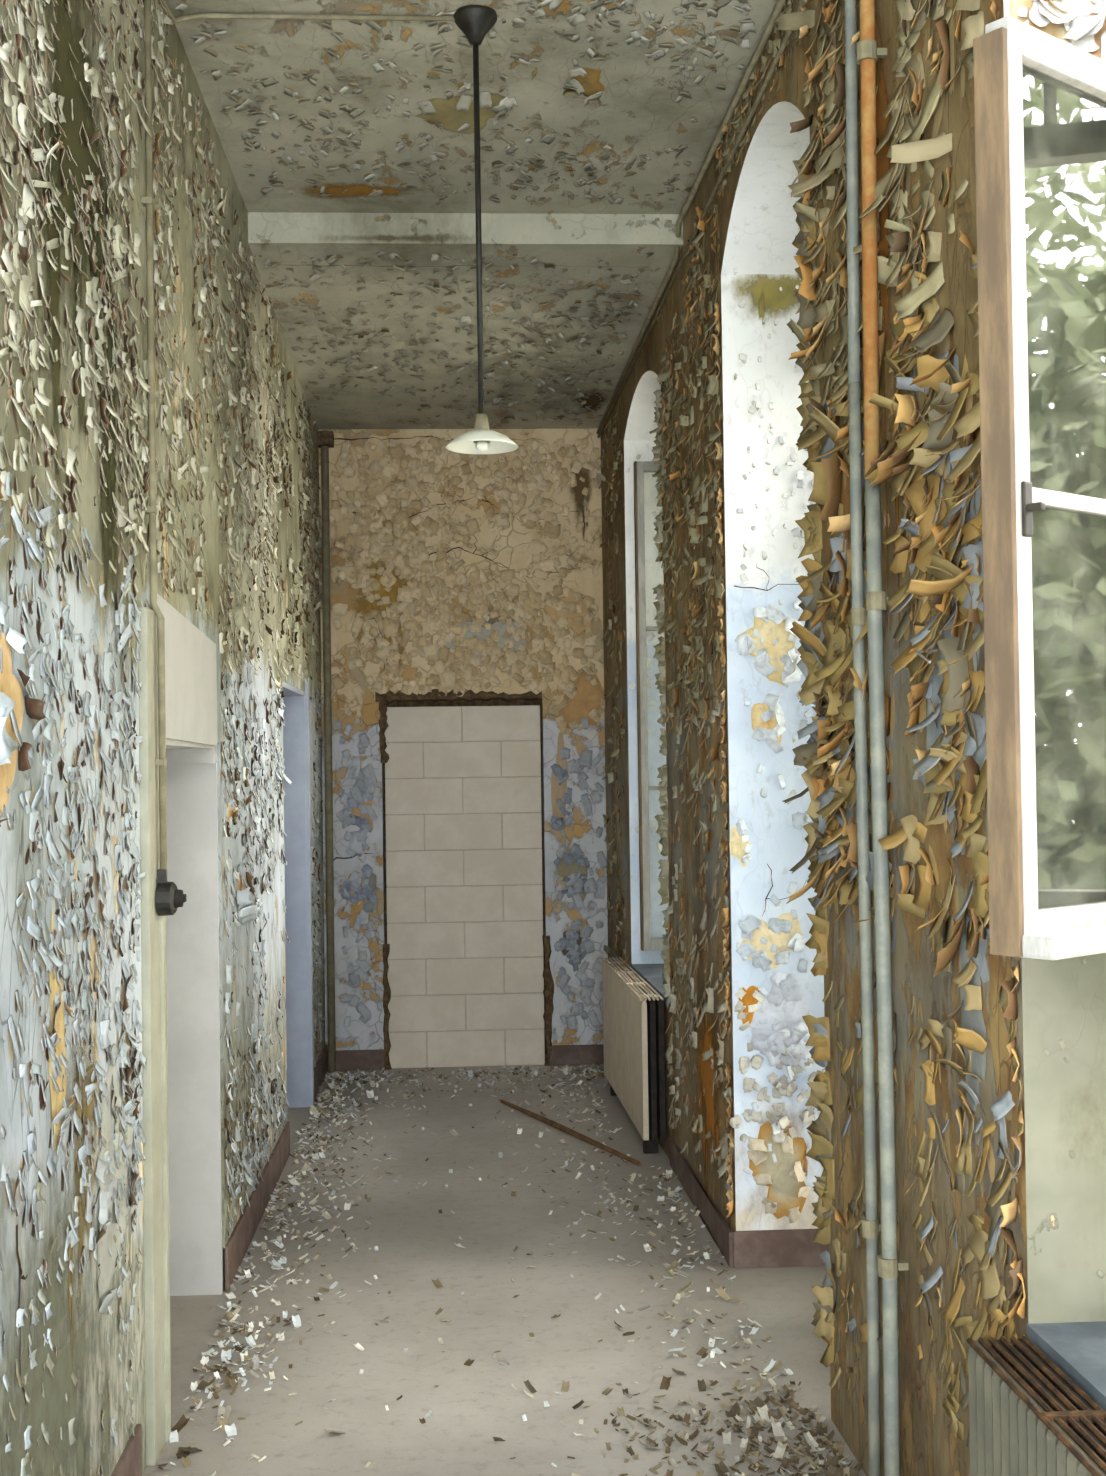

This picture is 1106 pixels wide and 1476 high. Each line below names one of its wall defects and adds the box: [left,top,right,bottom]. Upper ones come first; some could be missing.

peeling [487,0,755,106]
rust [876,58,892,182]
rust [878,200,890,258]
rust [878,282,896,442]
peeling [0,0,695,1476]
peeling [634,0,1106,1450]